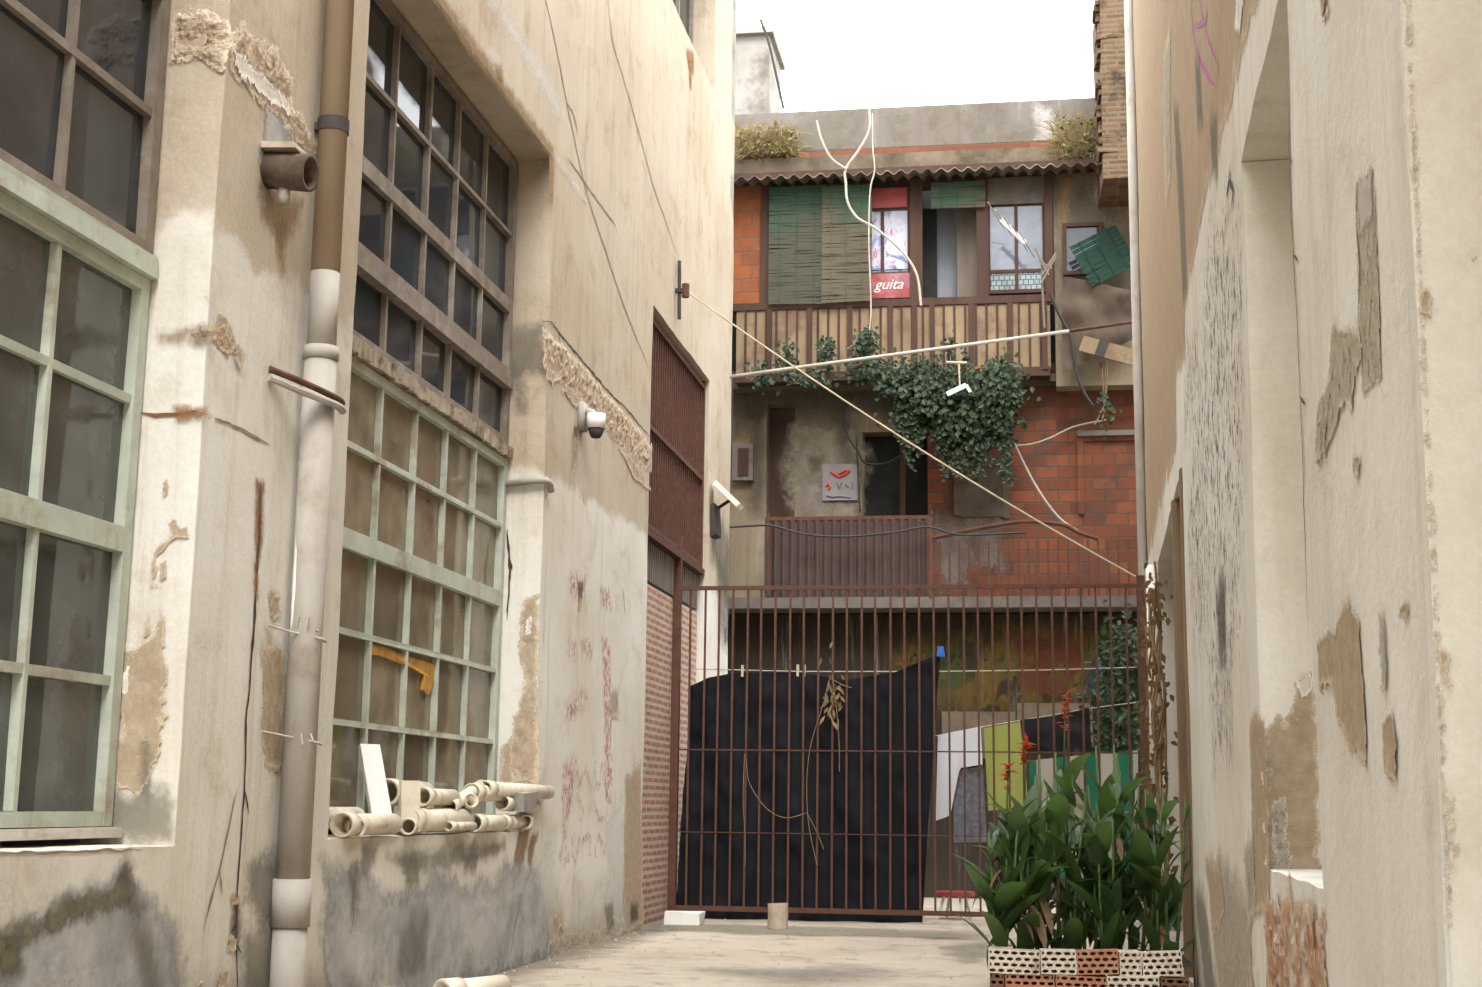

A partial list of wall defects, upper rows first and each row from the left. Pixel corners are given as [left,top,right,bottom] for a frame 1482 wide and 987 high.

spalling [168,8,318,165]
spalling [1407,63,1432,446]
peeling [1133,0,1408,987]
peeling [115,613,169,797]
peeling [499,593,542,784]
spalling [1426,471,1460,928]